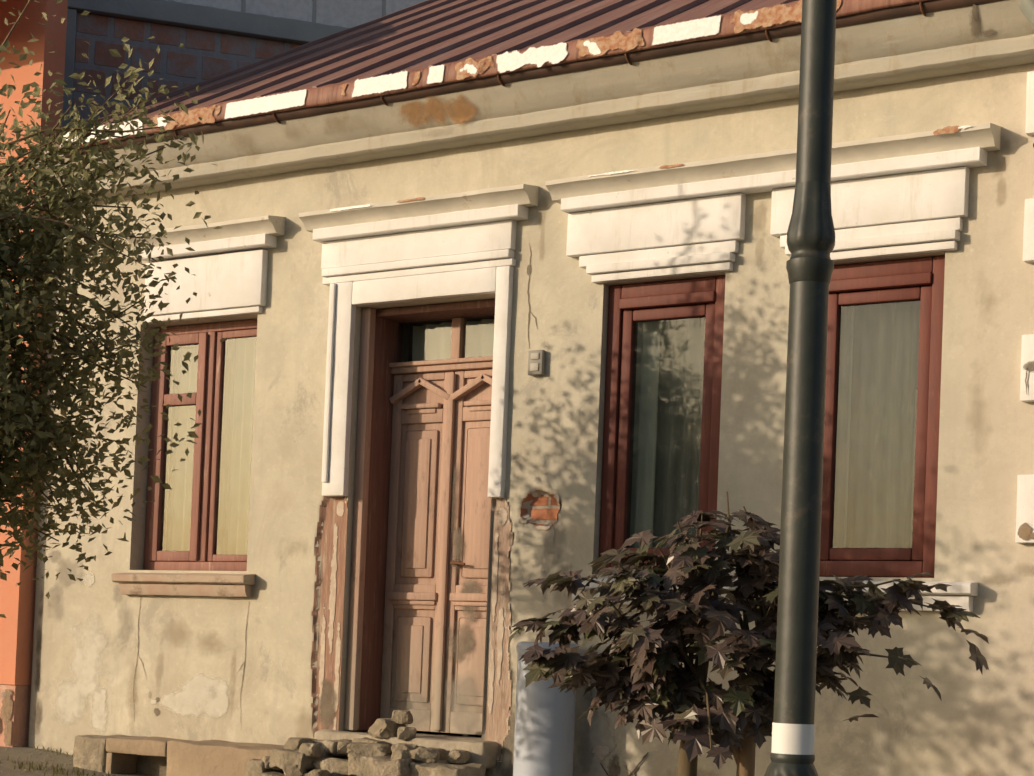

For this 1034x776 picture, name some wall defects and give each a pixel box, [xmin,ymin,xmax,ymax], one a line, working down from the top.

corrosion [401,96,476,124]
crack [527,245,537,345]
spalling [1023,361,1034,394]
spalling [1018,523,1034,540]
crack [133,598,147,714]
crack [237,600,250,722]
peeling [311,496,348,738]
peeling [485,490,562,762]
crack [600,752,649,776]